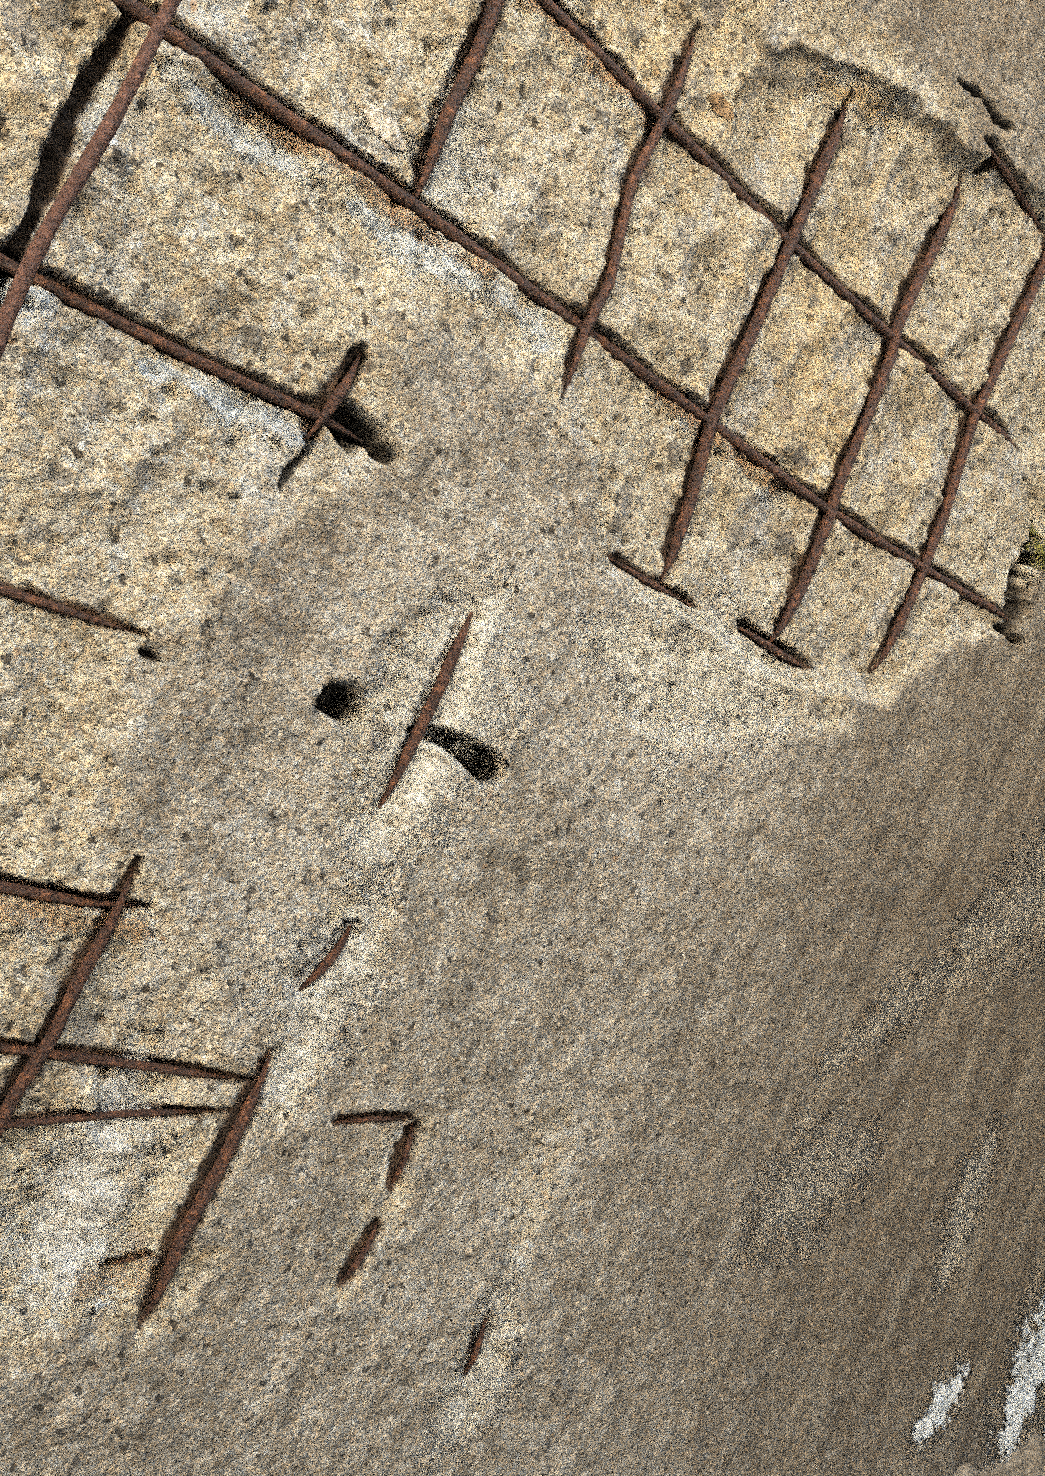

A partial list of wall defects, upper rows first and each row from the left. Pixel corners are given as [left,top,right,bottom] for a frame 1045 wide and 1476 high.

spalling [0,0,122,239]
spalling [37,0,1045,751]
spalling [0,285,398,1376]
spalling [333,572,502,851]
spalling [322,1114,435,1311]
spalling [441,1103,571,1432]
leakage [913,1363,970,1450]
leakage [990,1296,1045,1462]